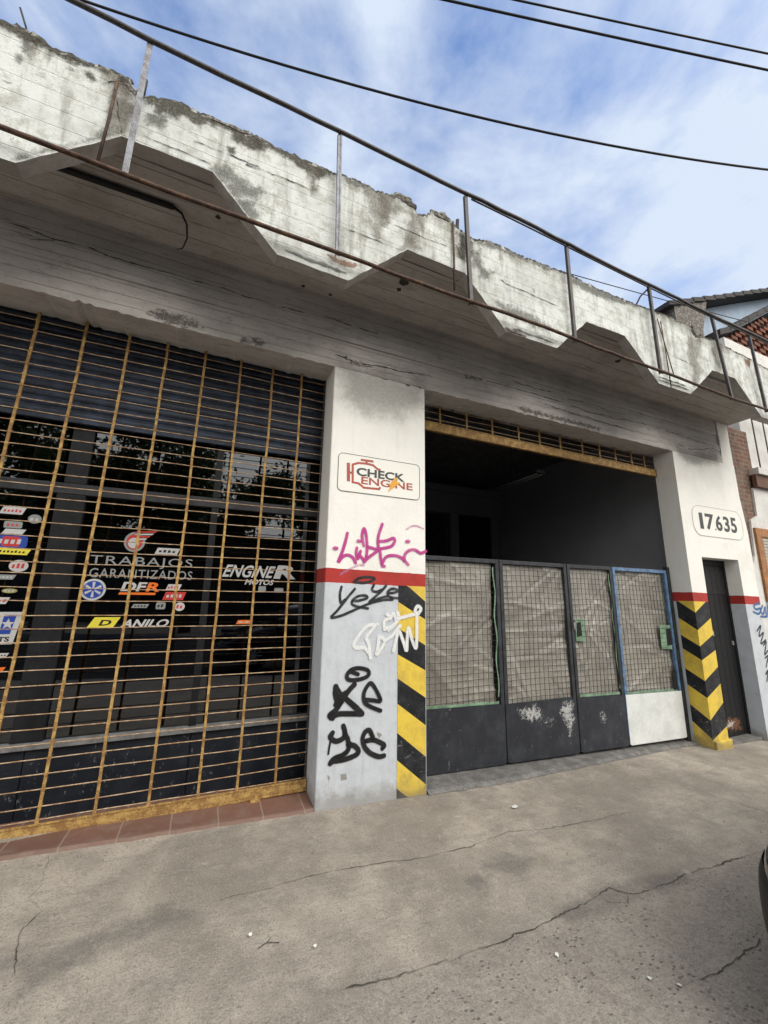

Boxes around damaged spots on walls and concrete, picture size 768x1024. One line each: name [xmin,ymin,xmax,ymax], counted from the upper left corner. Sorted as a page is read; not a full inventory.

damp [0,20,109,81]
spalling [117,74,138,95]
spalling [206,116,267,142]
damp [345,177,394,235]
spalling [389,192,417,210]
crack [486,858,740,947]
crack [702,938,760,979]
crack [345,971,409,989]